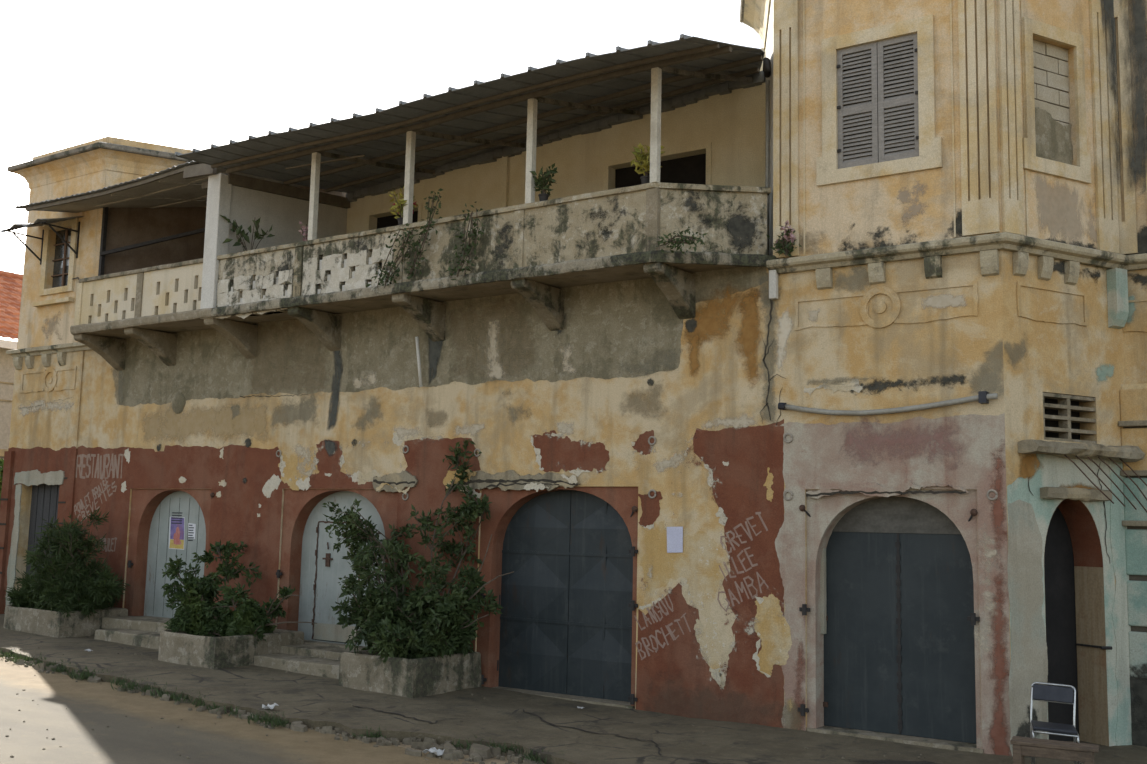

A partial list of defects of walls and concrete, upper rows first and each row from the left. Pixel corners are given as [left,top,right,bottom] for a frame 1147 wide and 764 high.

damp [1101,0,1147,188]
damp [493,222,513,265]
damp [578,197,625,247]
damp [684,190,711,228]
damp [725,205,763,252]
damp [1125,225,1147,255]
crack [761,294,786,425]
peeling [257,441,411,517]
flaking render [561,468,603,484]
peeling [638,438,792,689]